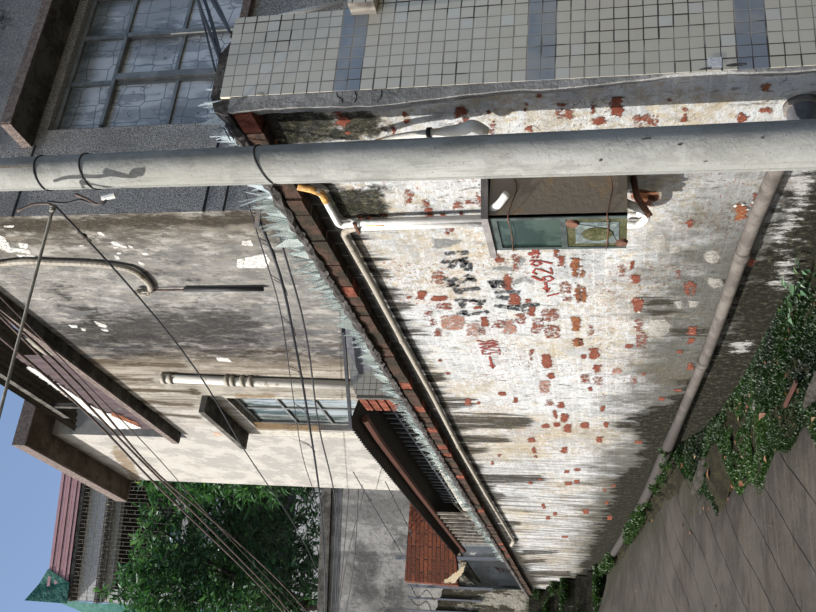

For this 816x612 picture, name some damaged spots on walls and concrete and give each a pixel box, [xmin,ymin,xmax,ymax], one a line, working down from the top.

damp [275,111,391,144]
spalling [591,97,659,127]
corrosion [297,184,330,204]
peeling [0,225,35,258]
damp [3,211,289,233]
spalling [407,250,561,339]
spalling [552,249,588,303]
spalling [529,349,589,433]
spalling [571,317,603,391]
damp [518,171,816,585]
damp [439,397,534,454]
damp [462,465,546,501]